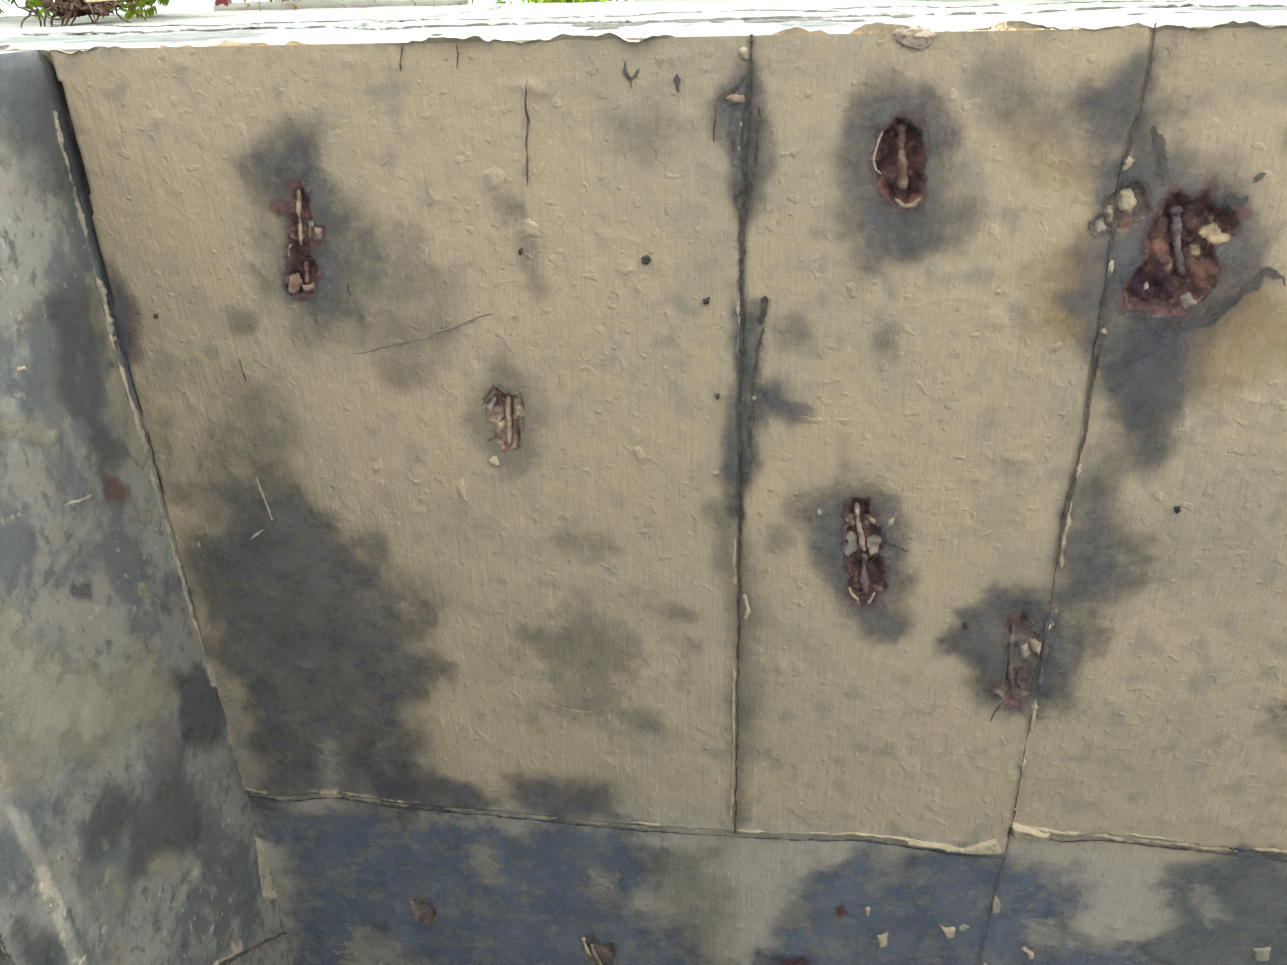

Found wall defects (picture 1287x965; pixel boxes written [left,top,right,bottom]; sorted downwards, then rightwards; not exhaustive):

water stain [0,54,82,193]
spalling [869,115,928,210]
spalling [269,179,326,300]
spalling [1088,179,1251,318]
spalling [482,385,525,466]
crack [22,3,1007,833]
spalling [841,497,909,607]
water stain [941,486,1140,712]
crack [978,0,1287,965]
water stain [173,669,227,746]
water stain [191,479,701,965]
water stain [756,846,1287,965]